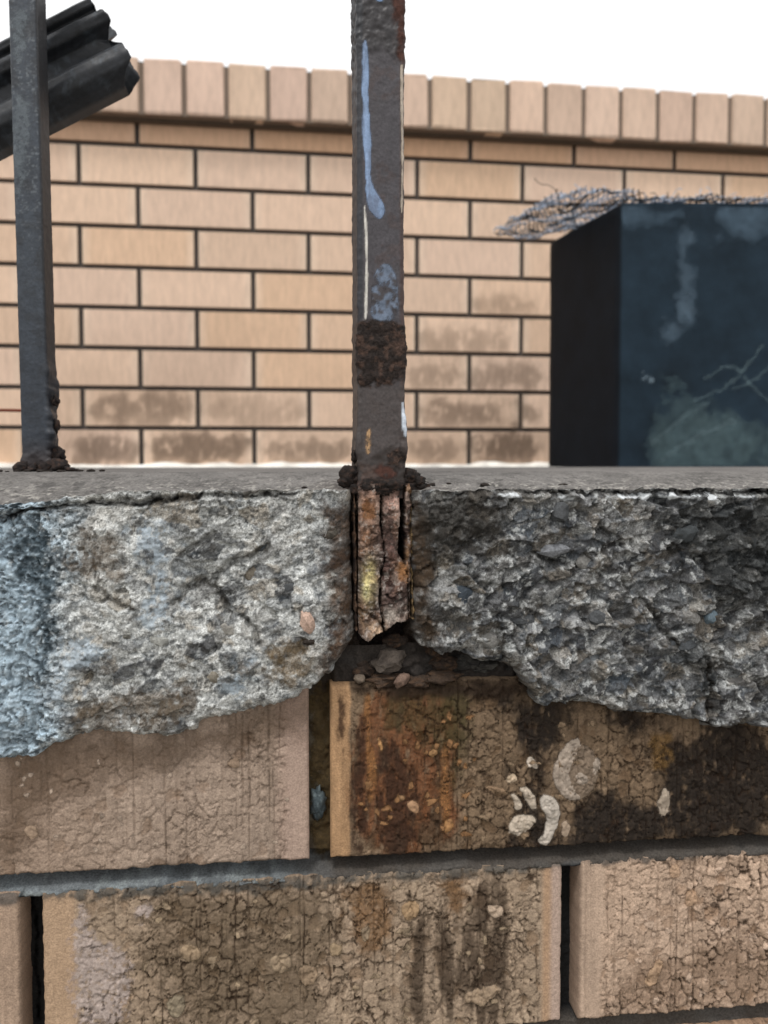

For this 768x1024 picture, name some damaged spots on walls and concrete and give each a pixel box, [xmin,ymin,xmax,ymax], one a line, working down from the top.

corrosion [393,0,406,60]
water stain [367,738,383,781]
corrosion [352,715,419,855]
peeling [358,781,413,825]
peeling [403,731,477,769]
peeling [425,792,489,841]
water stain [384,679,768,848]